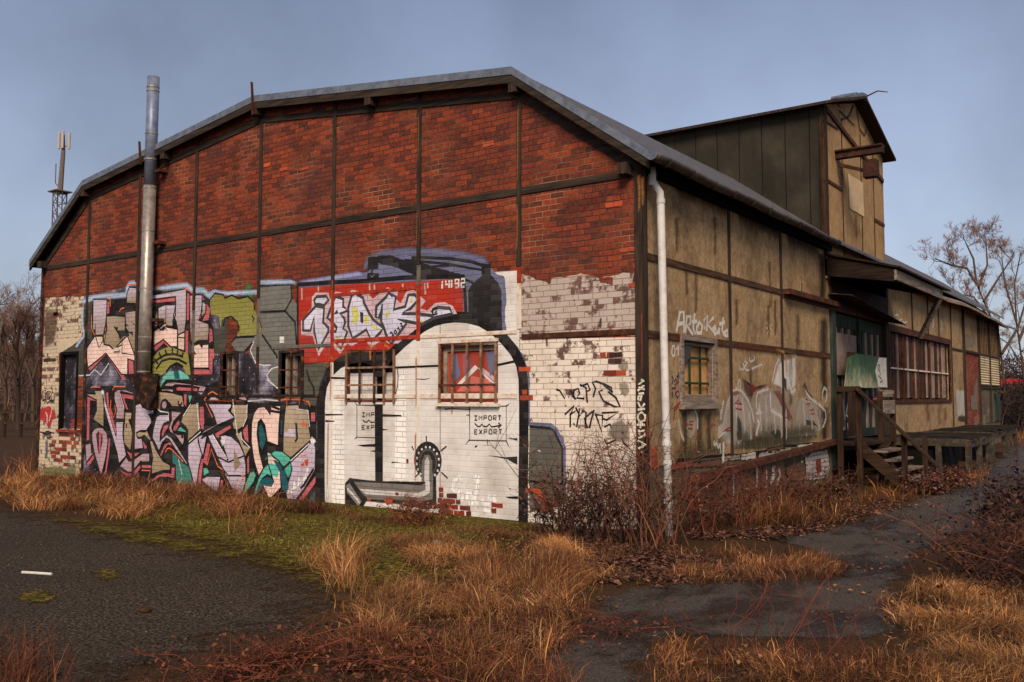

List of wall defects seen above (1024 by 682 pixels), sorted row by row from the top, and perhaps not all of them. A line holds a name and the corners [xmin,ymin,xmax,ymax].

spalling [600,352,626,376]
peeling [50,429,81,466]
peeling [436,487,471,516]